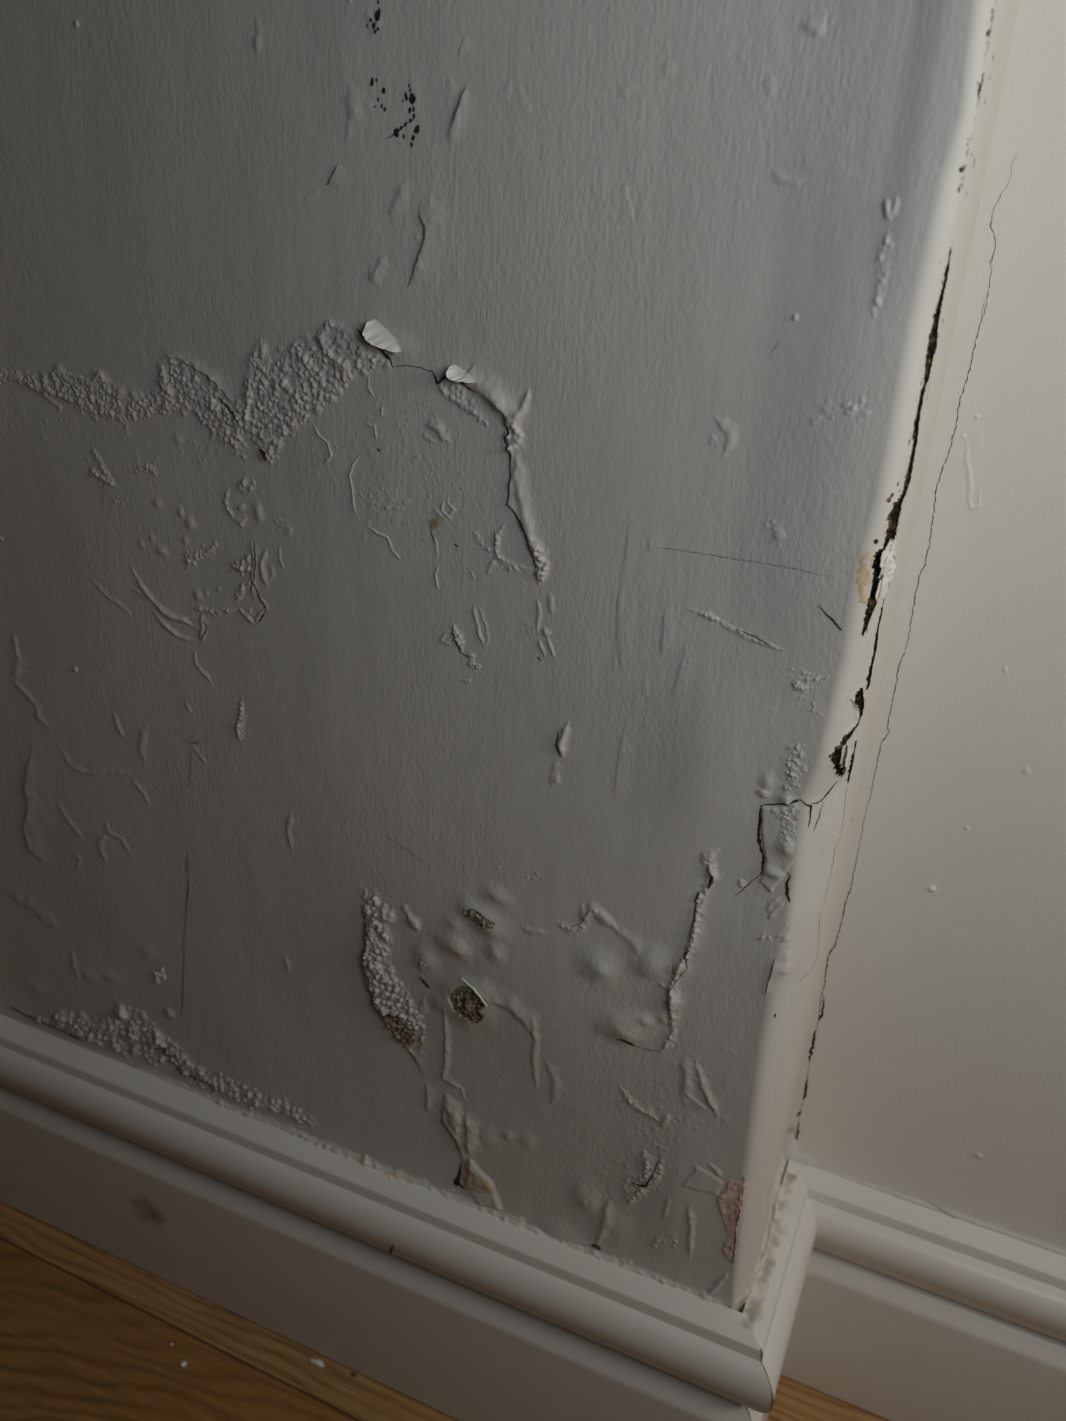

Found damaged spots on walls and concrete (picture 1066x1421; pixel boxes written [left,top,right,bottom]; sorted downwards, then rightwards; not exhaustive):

peeling [356,315,556,661]
peeling [90,536,276,644]
crack [658,155,1017,1140]
flaking render [737,736,808,943]
flaking render [462,909,494,929]
peeling [9,999,320,1129]
flaking render [380,1013,423,1053]
flaking render [448,986,485,1023]
peeling [440,1092,541,1211]
peeling [527,1045,749,1262]